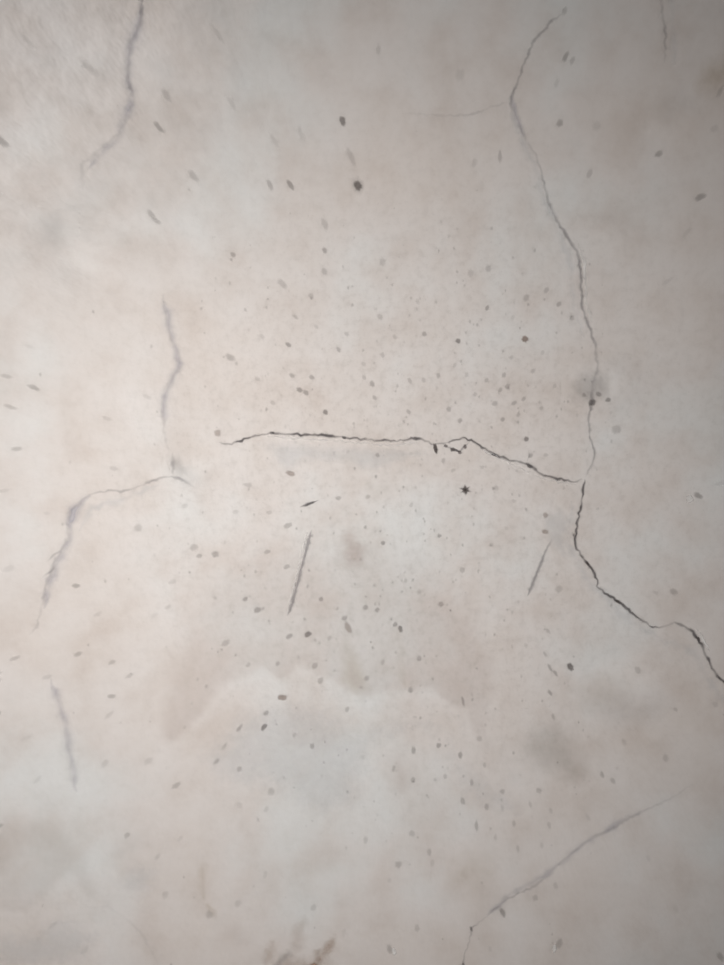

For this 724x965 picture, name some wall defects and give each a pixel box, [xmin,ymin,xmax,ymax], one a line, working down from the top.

crack [237,432,357,442]
crack [410,437,653,628]
crack [691,630,724,682]